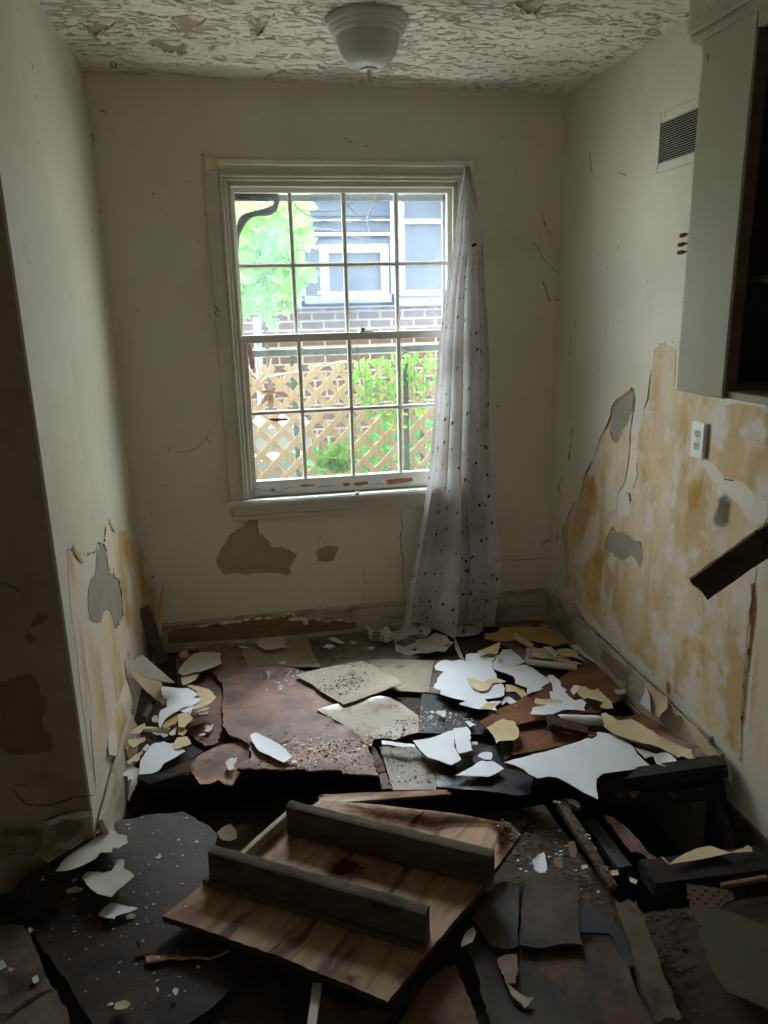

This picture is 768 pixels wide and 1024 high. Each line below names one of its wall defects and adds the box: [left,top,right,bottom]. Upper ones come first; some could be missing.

peeling [147,15,209,56]
peeling [248,16,273,37]
peeling [67,518,375,789]
peeling [562,342,768,805]